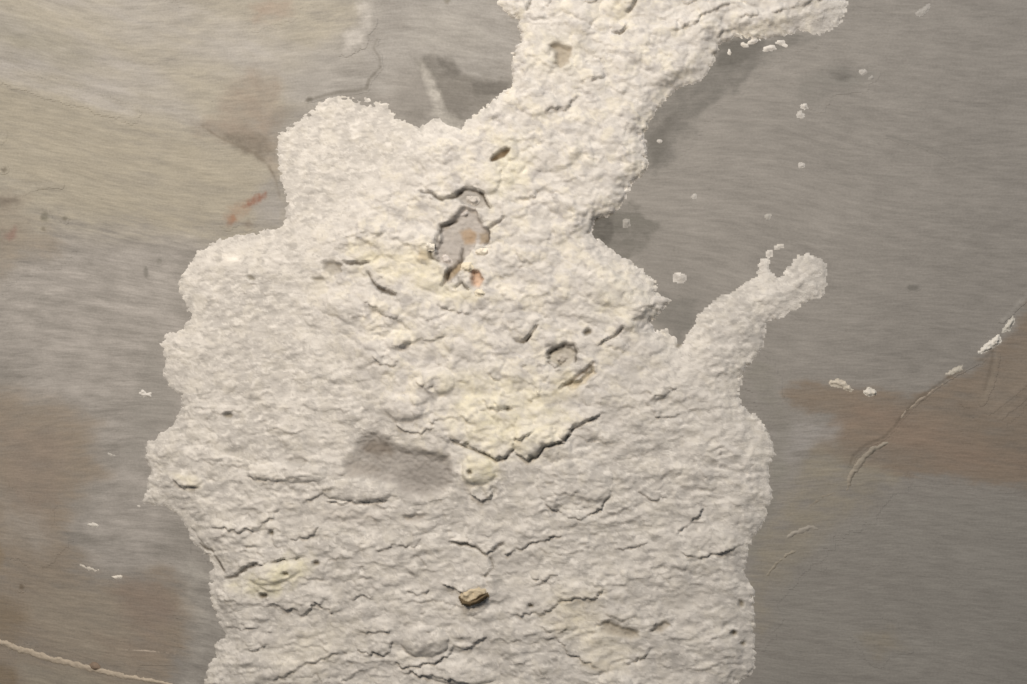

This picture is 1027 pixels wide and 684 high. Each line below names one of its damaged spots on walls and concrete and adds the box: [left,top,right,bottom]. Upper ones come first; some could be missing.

leakage [790,60,881,113]
spalling [415,185,493,290]
crack [417,186,507,292]
crack [340,259,398,298]
leakage [116,0,848,684]
crack [513,324,626,392]
crack [451,417,596,465]
leakage [739,302,1027,684]
crack [198,541,288,581]
crack [448,541,506,580]